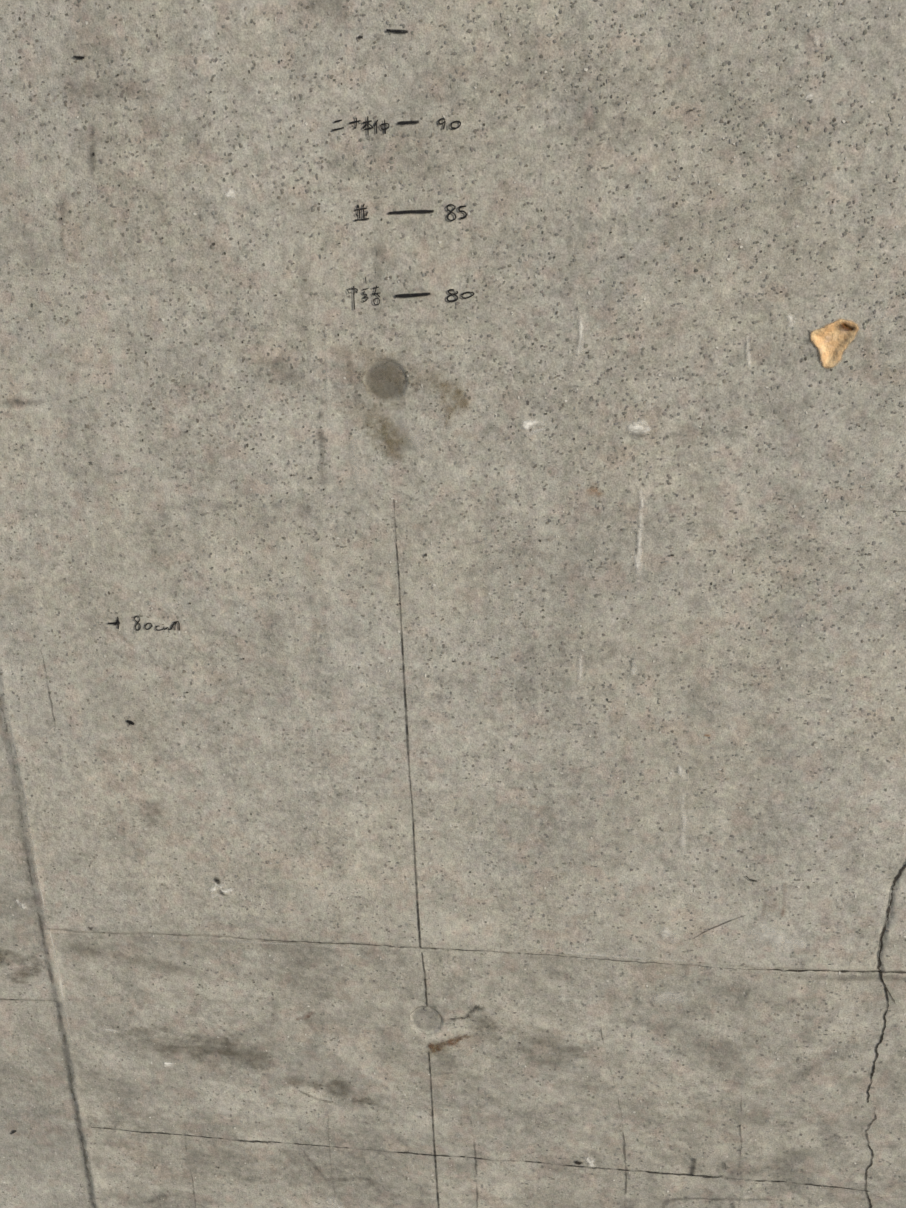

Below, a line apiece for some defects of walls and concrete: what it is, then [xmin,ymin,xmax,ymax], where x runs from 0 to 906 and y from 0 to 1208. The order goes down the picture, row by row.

crack [865,864,906,1208]